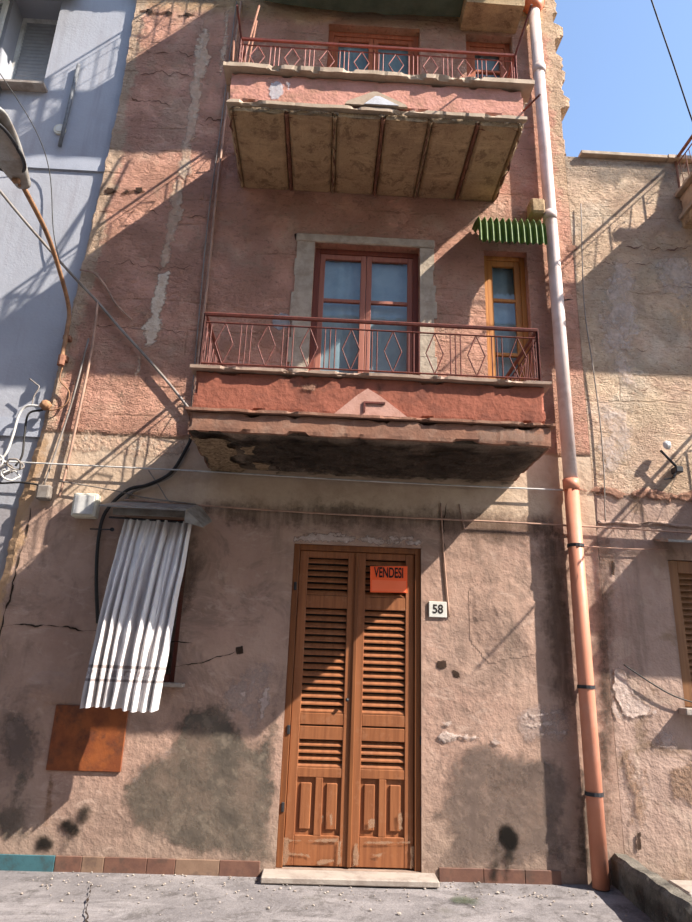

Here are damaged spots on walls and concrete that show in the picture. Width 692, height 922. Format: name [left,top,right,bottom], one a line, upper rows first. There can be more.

peeling [251,81,339,115]
flaking render [141,15,229,345]
crack [0,509,96,635]
crack [172,641,234,665]
flaking render [613,668,657,718]
damp [0,715,38,839]
damp [124,707,277,861]
damp [435,745,565,879]